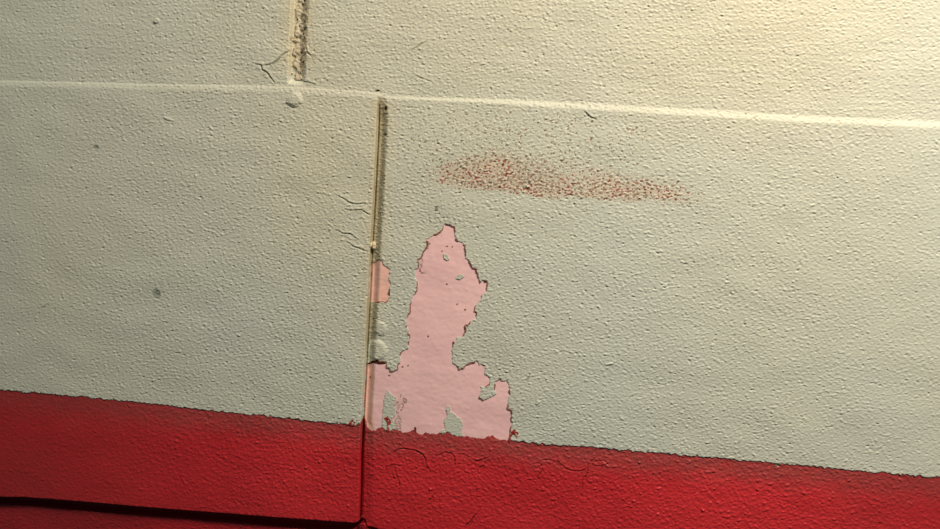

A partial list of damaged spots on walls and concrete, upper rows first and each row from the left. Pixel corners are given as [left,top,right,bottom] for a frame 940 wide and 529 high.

peeling [363,224,512,440]